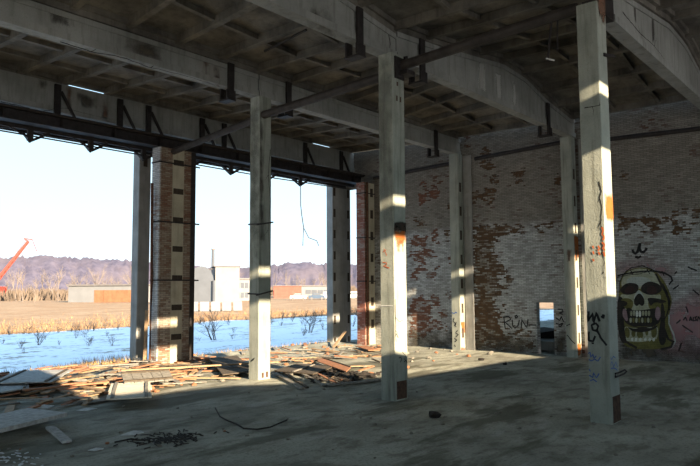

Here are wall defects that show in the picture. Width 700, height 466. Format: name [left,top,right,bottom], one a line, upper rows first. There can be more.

rust [394,230,406,247]
peeling [410,216,450,281]
crack [597,181,605,278]
spalling [618,204,700,235]
peeling [408,291,451,340]
peeling [473,221,560,353]